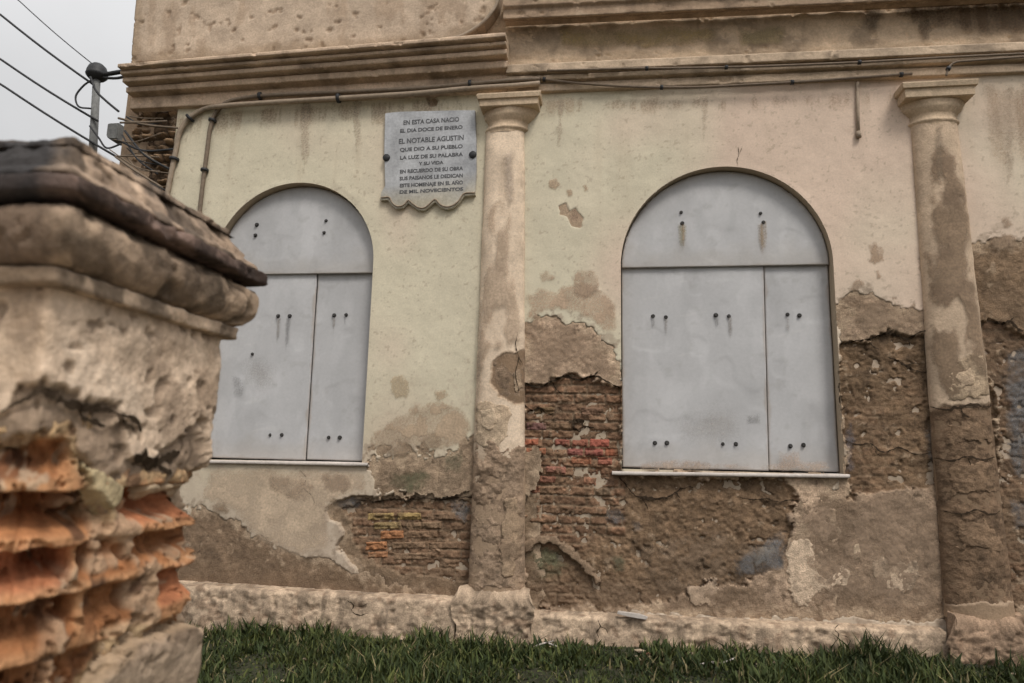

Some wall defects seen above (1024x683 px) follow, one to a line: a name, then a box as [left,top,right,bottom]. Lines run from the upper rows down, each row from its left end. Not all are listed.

spalling [549,179,583,228]
leakage [478,206,518,377]
leakage [928,127,986,395]
spalling [0,219,1024,683]
crack [515,332,620,432]
crack [932,403,991,418]
crack [944,509,1000,520]